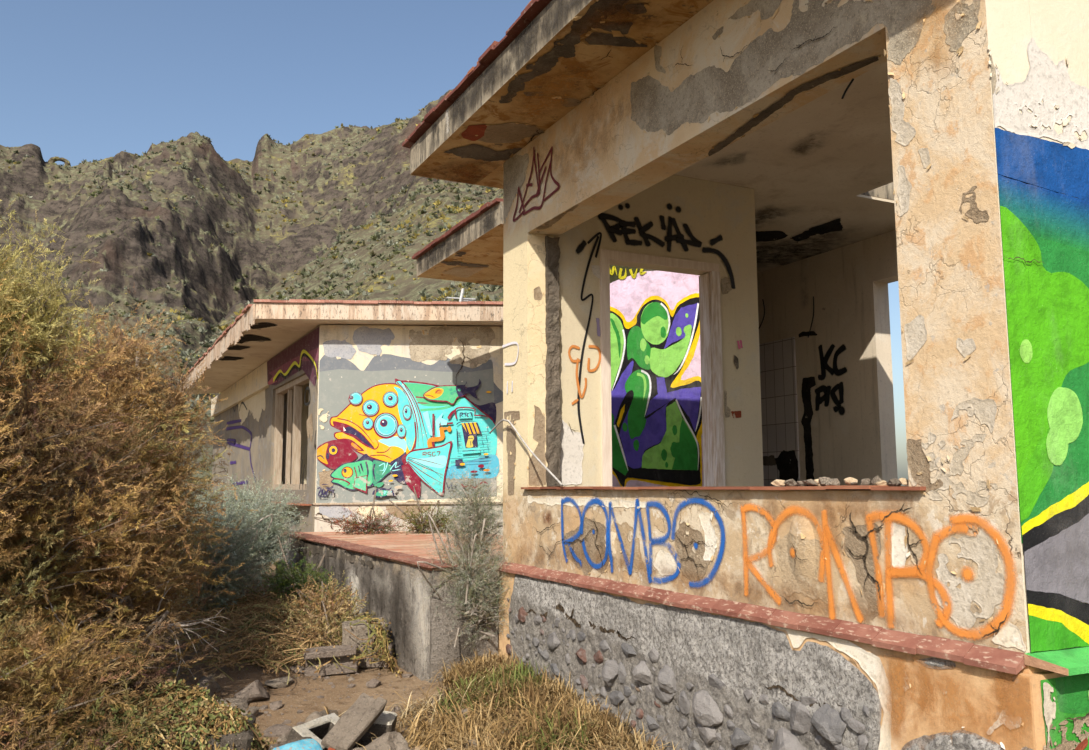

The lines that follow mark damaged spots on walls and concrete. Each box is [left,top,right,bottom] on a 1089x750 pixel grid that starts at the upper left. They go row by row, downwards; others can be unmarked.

leakage [432,0,581,138]
peeling [499,0,982,169]
peeling [988,38,1089,150]
leakage [411,163,490,185]
peeling [322,326,395,359]
peeling [906,397,998,512]
peeling [686,511,718,561]
crack [847,503,924,600]
peeling [889,523,911,568]
peeling [924,528,1029,653]
peeling [776,627,912,750]
peeling [1043,682,1068,750]